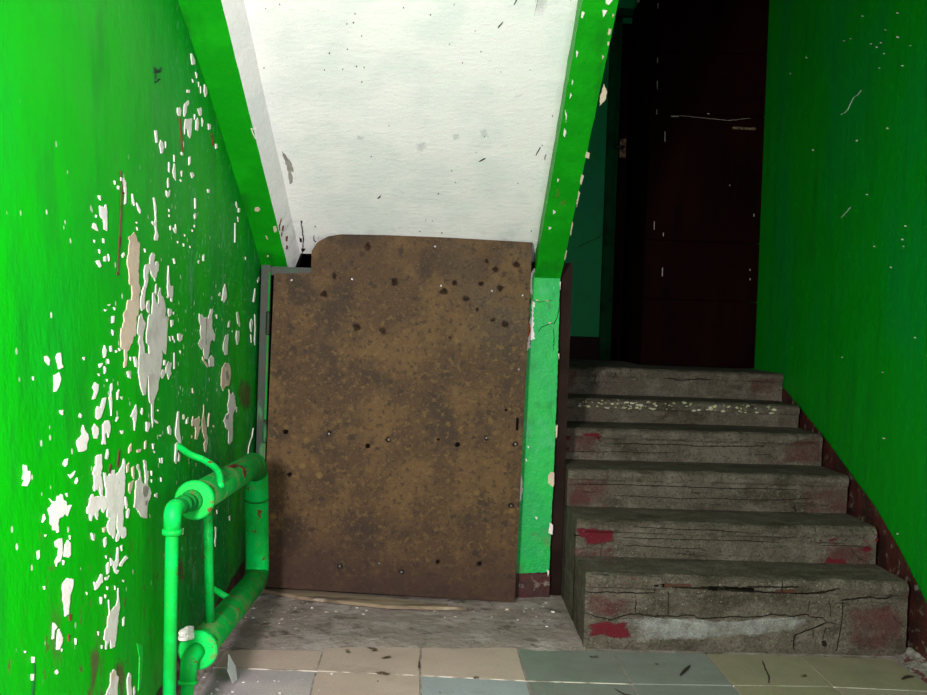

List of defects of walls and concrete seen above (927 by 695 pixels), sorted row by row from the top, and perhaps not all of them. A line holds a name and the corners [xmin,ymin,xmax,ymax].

peeling [154,53,211,197]
flaking render [527,268,535,351]
peeling [44,353,63,392]
peeling [76,177,256,649]
peeling [22,465,31,486]
peeling [42,493,72,566]
peeling [52,623,77,651]
peeling [62,578,74,621]
crack [585,582,900,651]
peeling [105,669,136,695]